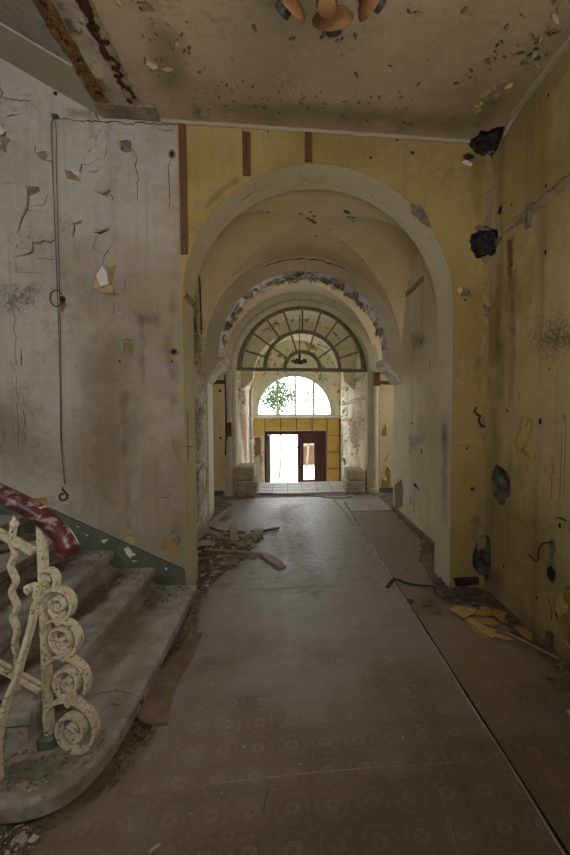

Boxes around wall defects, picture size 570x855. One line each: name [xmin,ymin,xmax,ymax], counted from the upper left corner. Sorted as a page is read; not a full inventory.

flaking render [117,139,132,153]
peeling [93,248,116,315]